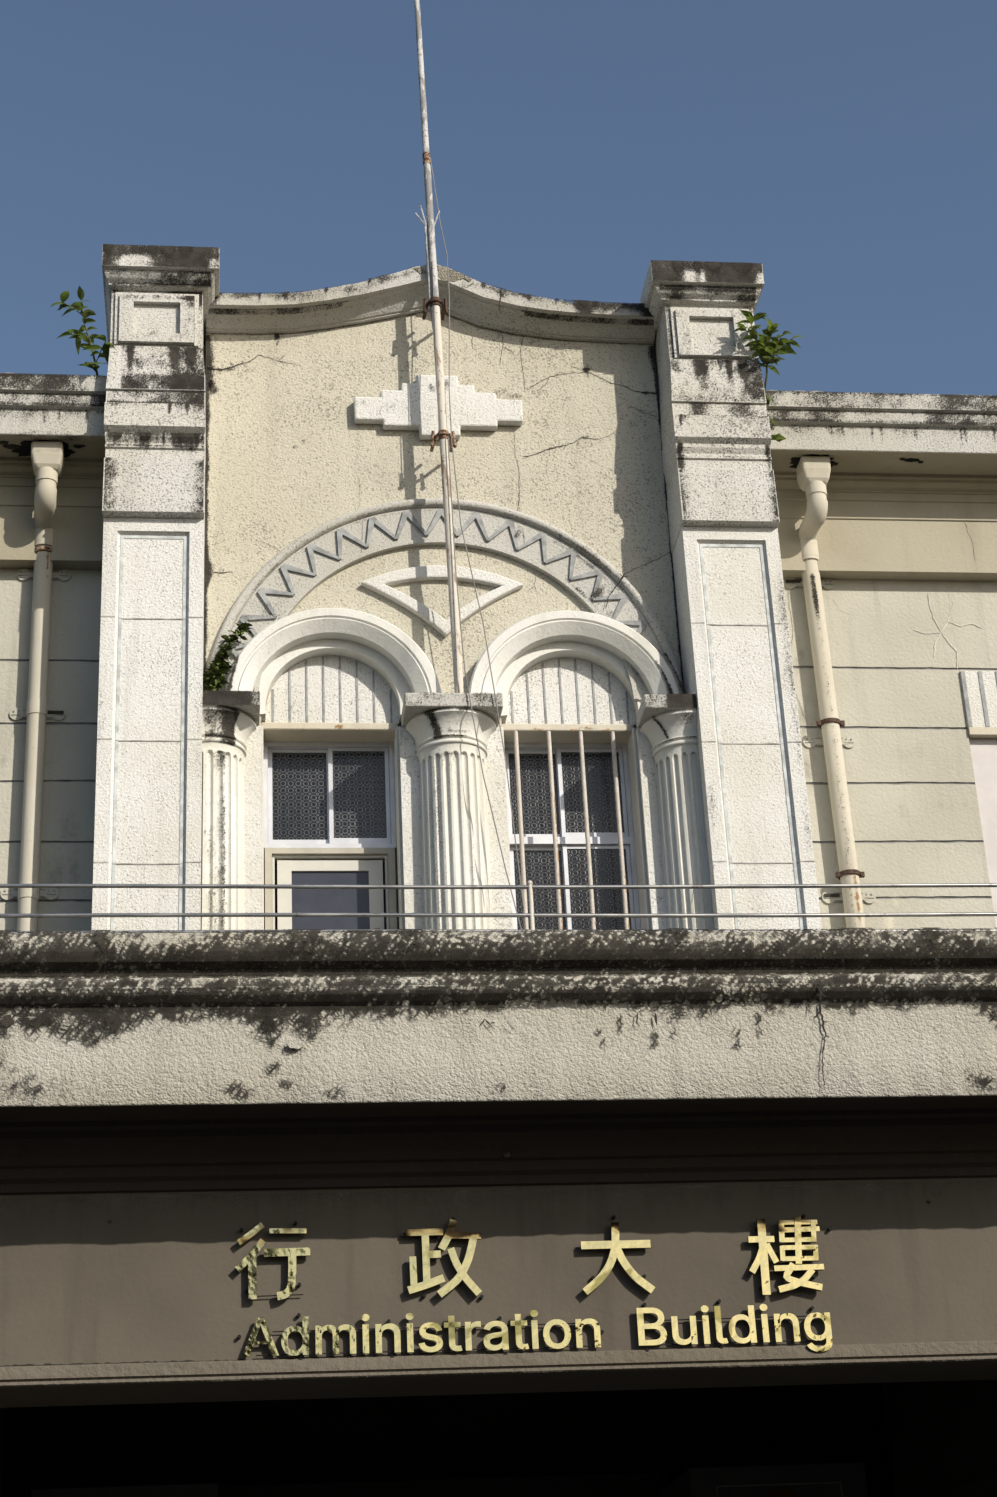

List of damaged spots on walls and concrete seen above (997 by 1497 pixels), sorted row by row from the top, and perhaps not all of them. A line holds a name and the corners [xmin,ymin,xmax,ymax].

crack [460,282,657,594]
water stain [0,244,997,1091]
water stain [0,1055,64,1097]
crack [815,1003,829,1085]